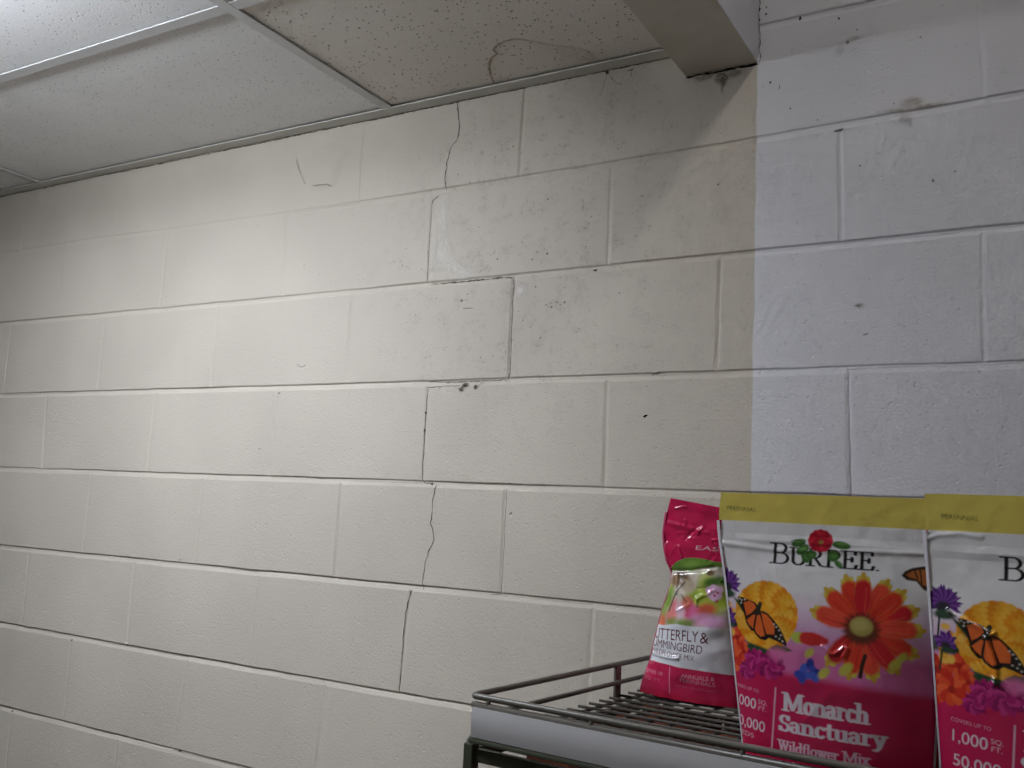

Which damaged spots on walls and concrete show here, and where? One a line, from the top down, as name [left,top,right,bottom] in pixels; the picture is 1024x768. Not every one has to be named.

crack [1,58,668,197]
crack [399,277,515,691]